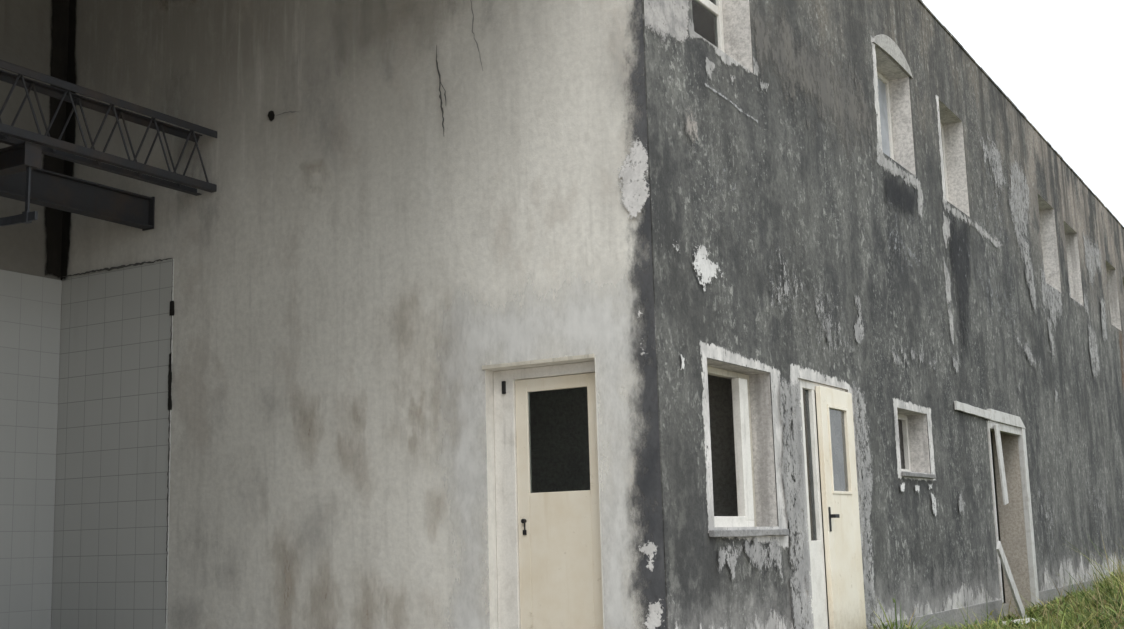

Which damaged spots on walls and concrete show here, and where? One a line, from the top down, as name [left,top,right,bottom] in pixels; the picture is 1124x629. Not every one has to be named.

crack [470,0,483,70]
crack [436,45,446,135]
peeling [618,136,650,219]
water stain [628,0,678,629]
spalling [692,245,723,291]
water stain [943,219,970,358]
water stain [1015,237,1108,377]
spalling [638,542,658,572]
spalling [642,599,664,629]
water stain [746,610,793,629]
water stain [872,581,1001,626]
water stain [1041,552,1124,591]